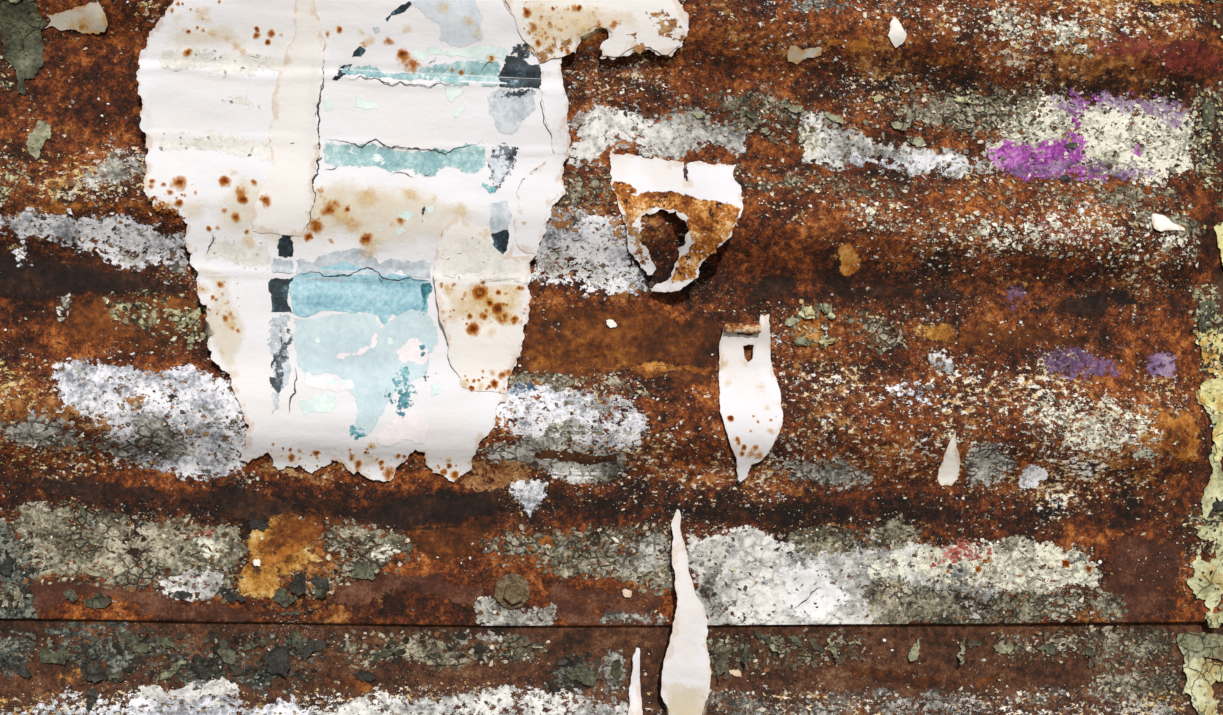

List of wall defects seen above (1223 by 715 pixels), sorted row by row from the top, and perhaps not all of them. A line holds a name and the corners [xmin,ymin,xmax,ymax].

corrosion [523,4,582,62]
corrosion [645,9,686,41]
corrosion [125,176,197,225]
corrosion [219,175,270,233]
corrosion [304,189,350,242]
corrosion [551,181,741,283]
corrosion [0,251,240,352]
corrosion [440,281,722,393]
peeling [436,0,1223,715]
corrosion [0,458,530,622]
peeling [0,288,658,715]
corrosion [1088,535,1189,622]